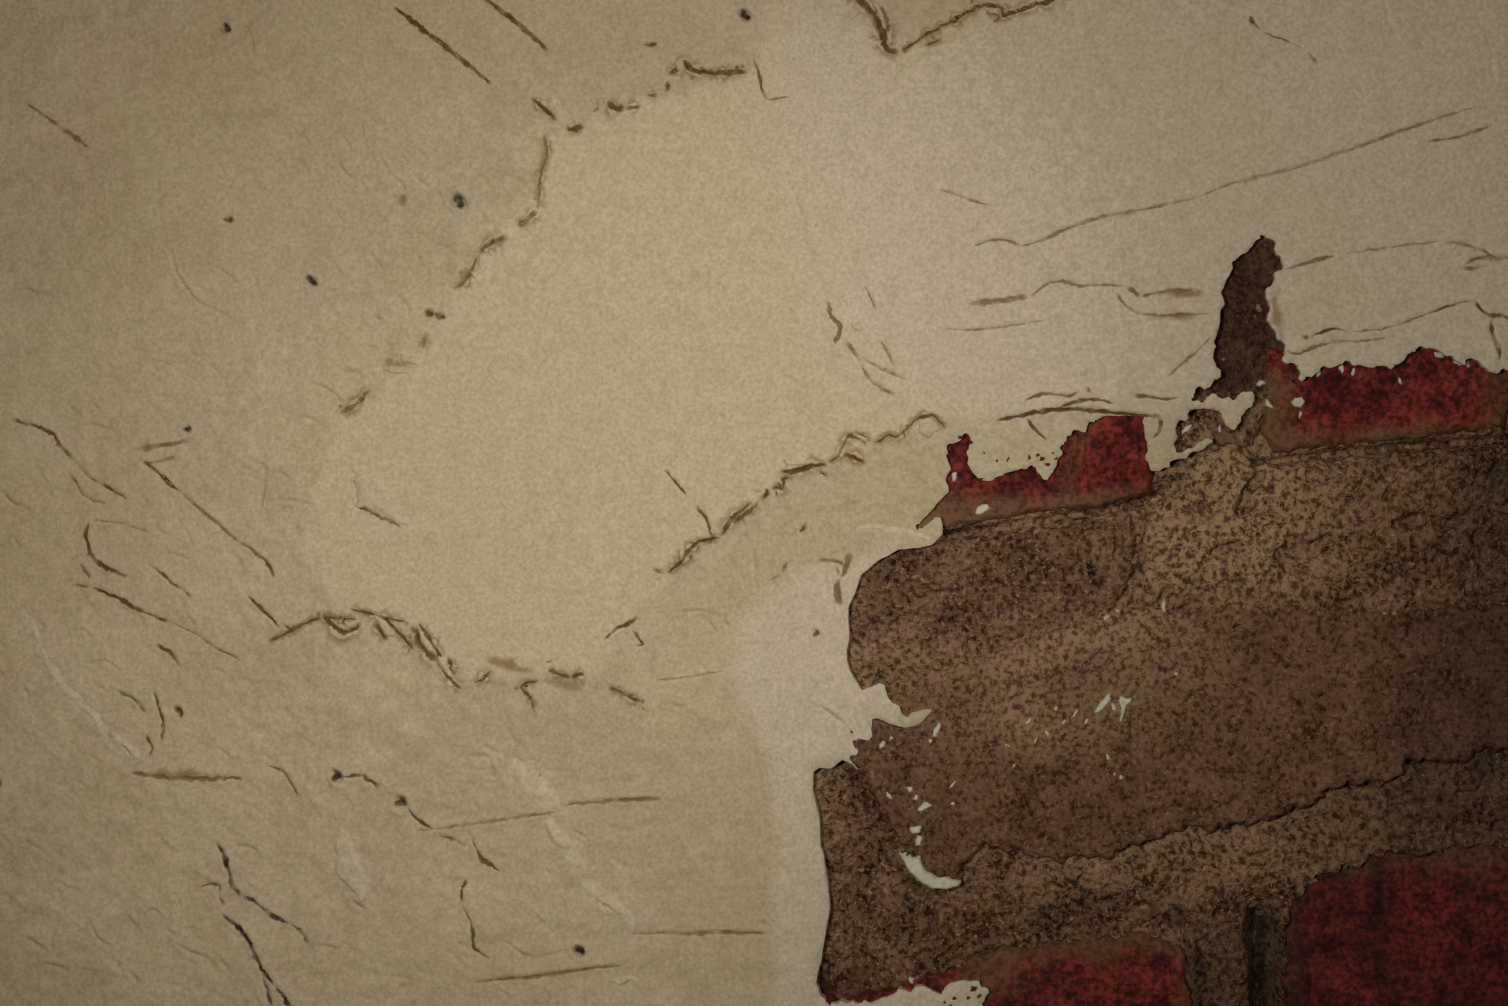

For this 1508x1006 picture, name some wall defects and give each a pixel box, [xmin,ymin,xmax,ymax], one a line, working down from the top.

crack [857,0,1054,53]
crack [458,57,763,287]
crack [1304,328,1336,338]
crack [1415,303,1508,357]
crack [346,354,417,411]
crack [146,462,200,509]
crack [656,411,943,572]
crack [246,546,637,701]
crack [606,620,644,646]
flaking render [814,236,1508,1006]